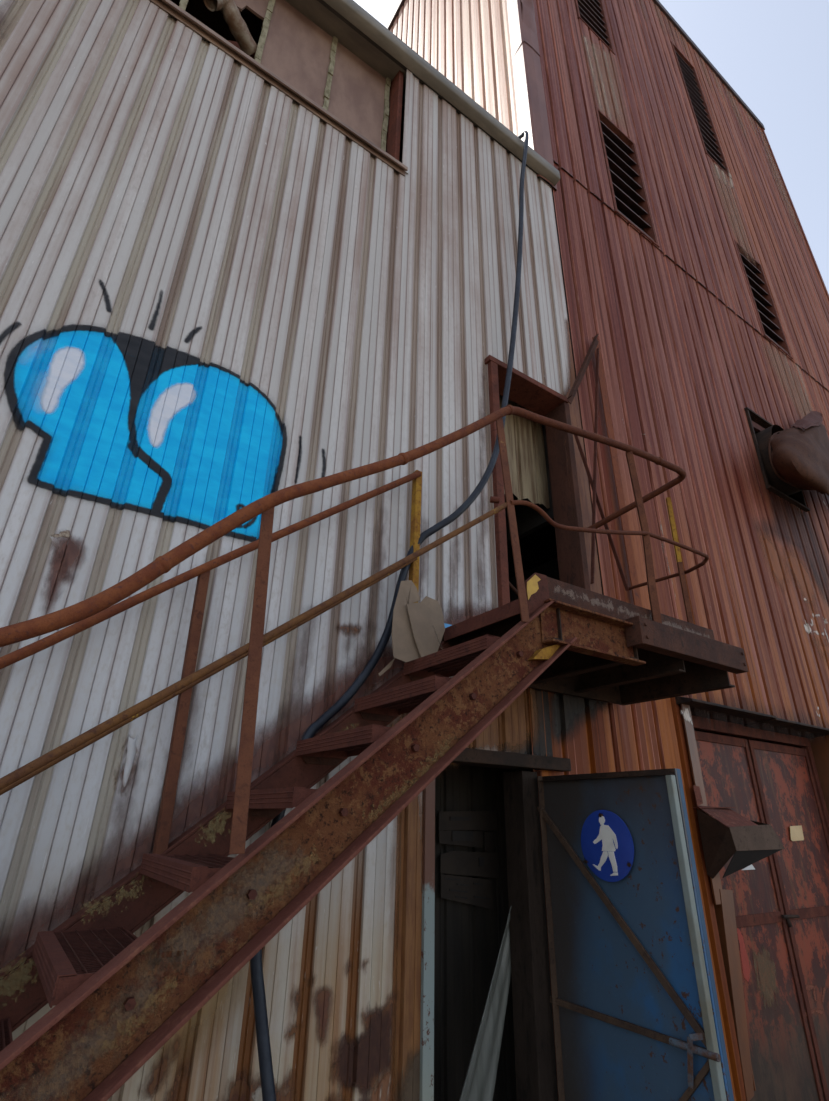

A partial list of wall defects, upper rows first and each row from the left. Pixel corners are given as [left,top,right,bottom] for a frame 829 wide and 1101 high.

rust [46,530,83,610]
rust [369,794,423,1101]